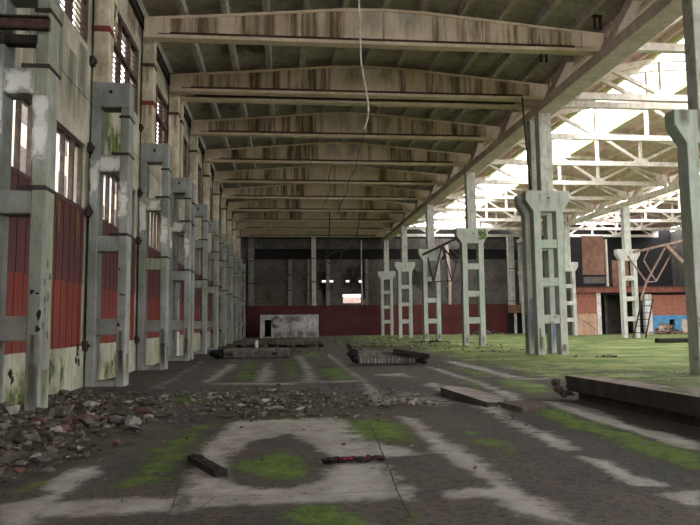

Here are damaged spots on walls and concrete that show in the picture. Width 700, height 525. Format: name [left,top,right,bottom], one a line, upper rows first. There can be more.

peeling [4,70,48,155]
peeling [89,156,120,195]
peeling [139,199,161,231]
peeling [30,260,51,338]
crack [370,424,509,517]